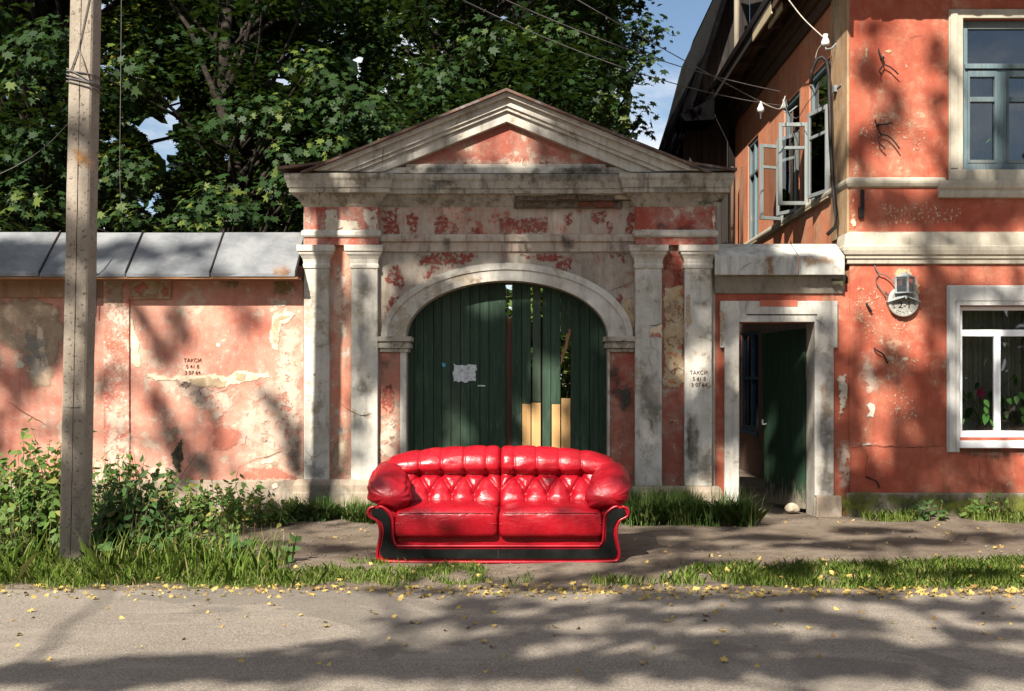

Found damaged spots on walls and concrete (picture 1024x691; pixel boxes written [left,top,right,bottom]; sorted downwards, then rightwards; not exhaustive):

peeling [434,216,480,234]
spalling [498,194,635,234]
peeling [417,252,478,279]
flaking render [648,253,692,389]
flaking render [105,281,300,489]
flaking render [821,374,848,420]
flaking render [378,385,397,458]
flaking render [838,442,884,486]